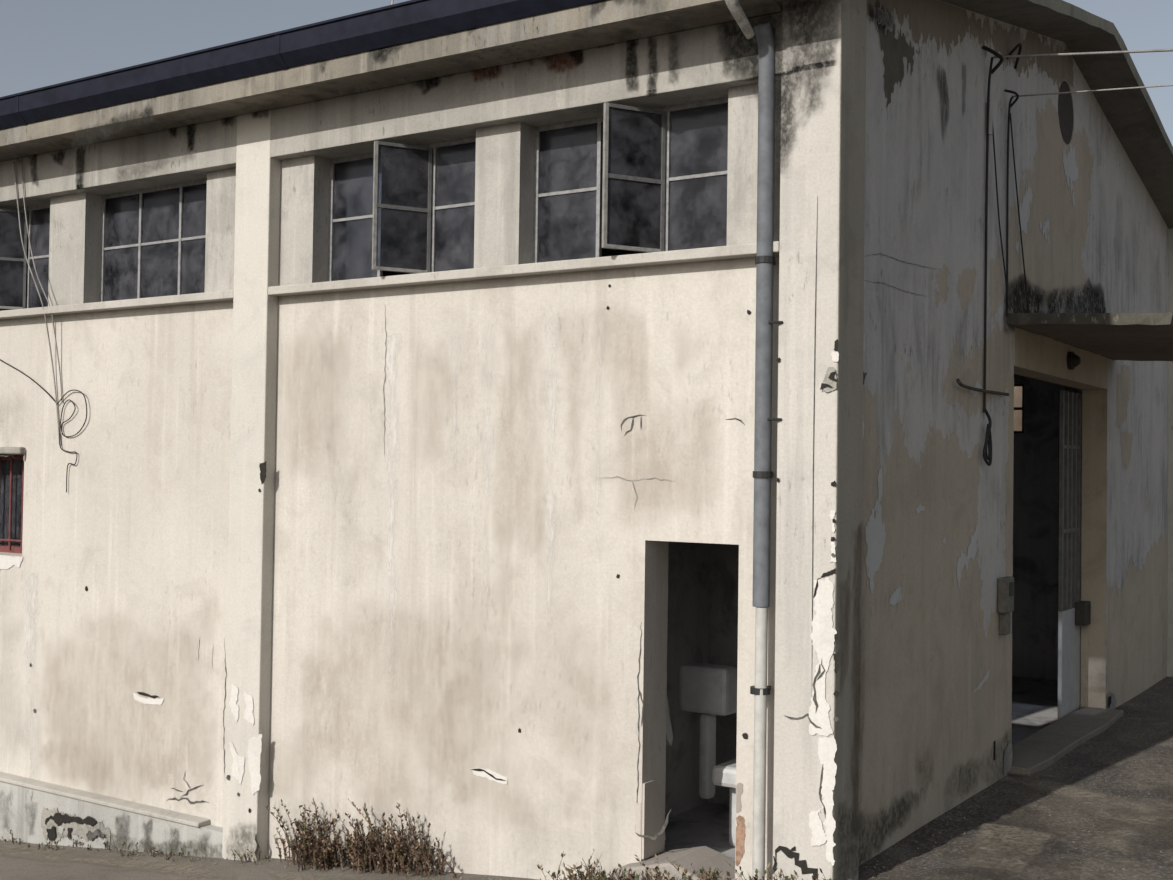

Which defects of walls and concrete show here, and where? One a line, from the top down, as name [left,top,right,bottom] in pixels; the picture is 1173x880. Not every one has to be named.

damp [722,0,833,159]
damp [938,73,948,120]
damp [1004,276,1106,329]
crack [621,415,646,436]
peeling [858,0,1094,866]
crack [612,476,670,508]
flaking render [133,692,164,705]
crack [168,639,227,804]
peeling [809,510,839,866]
flaking render [471,768,507,785]
flaking render [41,807,110,845]